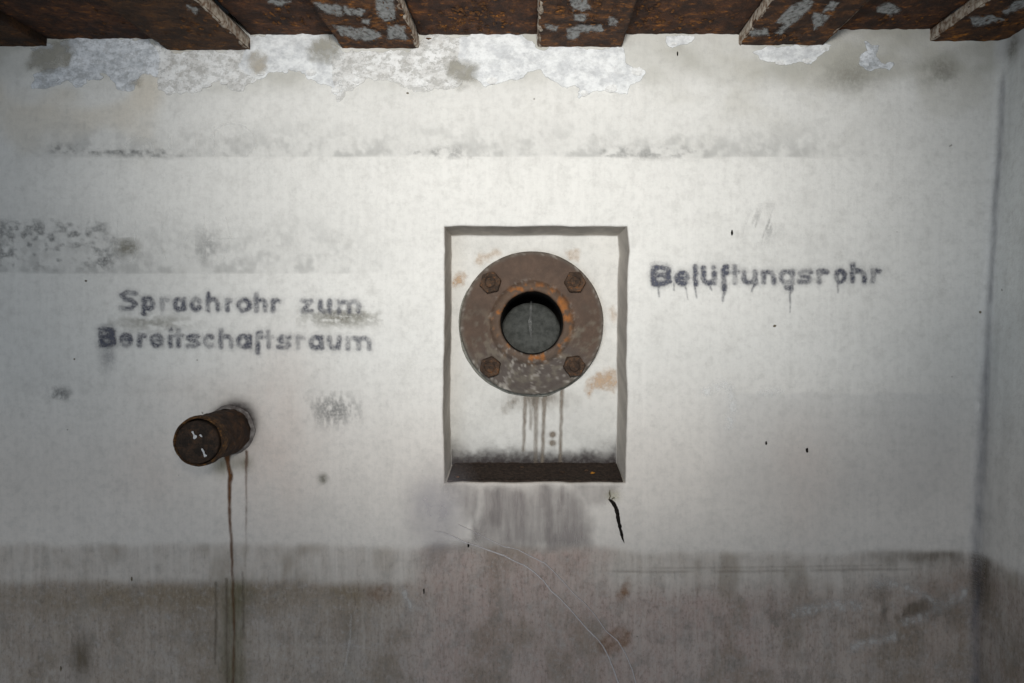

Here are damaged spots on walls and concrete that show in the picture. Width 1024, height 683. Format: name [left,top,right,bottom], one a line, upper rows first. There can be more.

peeling [29,34,646,102]
peeling [753,43,831,65]
peeling [859,41,894,71]
corrosion [220,455,233,565]
crack [608,490,624,542]